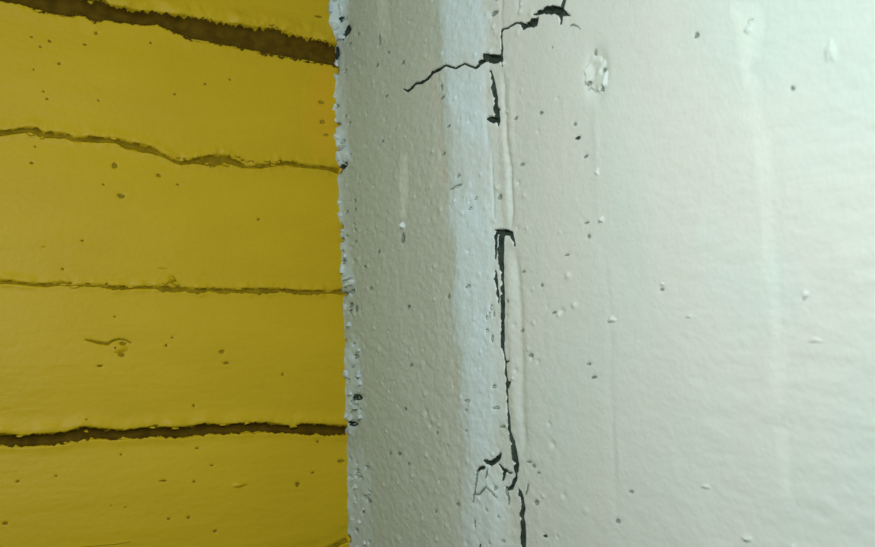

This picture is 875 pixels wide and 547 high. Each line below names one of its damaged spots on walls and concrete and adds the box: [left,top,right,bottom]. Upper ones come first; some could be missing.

crack [0,0,338,68]
crack [403,0,580,126]
crack [0,127,339,173]
crack [0,280,346,295]
crack [473,229,528,547]
crack [0,422,347,448]
crack [328,538,349,547]